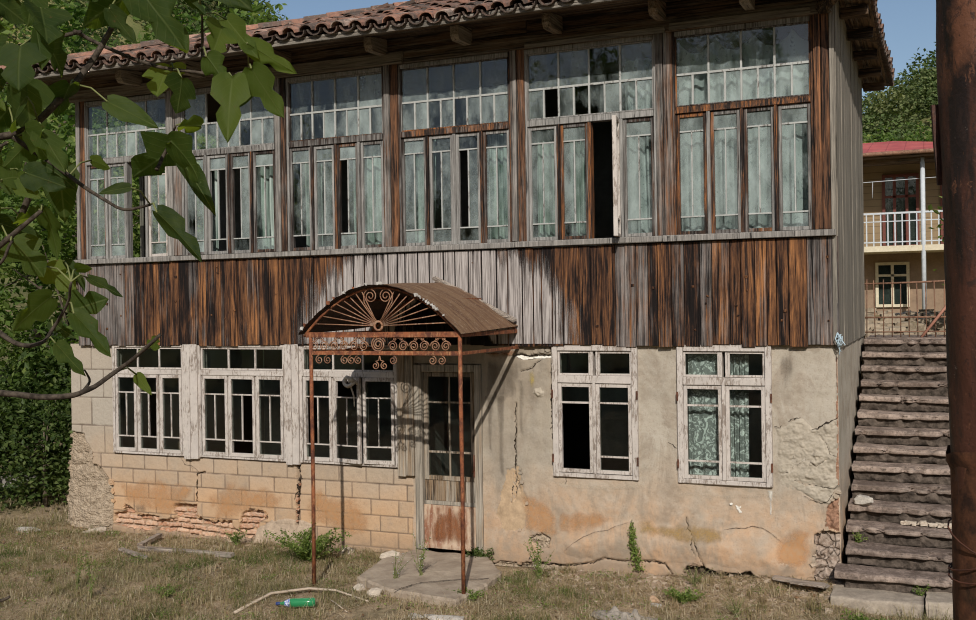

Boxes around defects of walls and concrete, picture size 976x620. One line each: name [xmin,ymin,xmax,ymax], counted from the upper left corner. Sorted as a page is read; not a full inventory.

crack [487,352,553,439]
spalling [66,432,268,539]
crack [295,467,303,524]
rust [434,508,461,540]
crack [512,403,520,494]
flaking render [808,357,842,580]